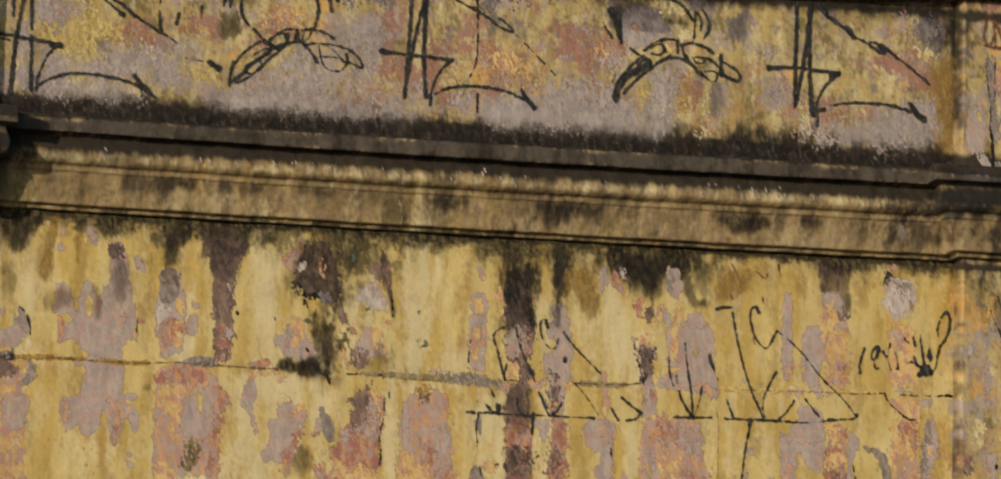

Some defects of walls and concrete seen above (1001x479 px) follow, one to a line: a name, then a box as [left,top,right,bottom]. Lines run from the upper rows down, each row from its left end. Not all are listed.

leakage [0,59,954,168]
leakage [156,177,187,194]
leakage [541,200,593,226]
leakage [0,207,954,332]
peeling [0,306,37,479]
crack [45,356,182,364]
crack [215,363,277,371]
leakage [312,313,335,364]
peeling [52,225,627,479]
crack [576,359,645,386]
peeling [963,361,1001,479]